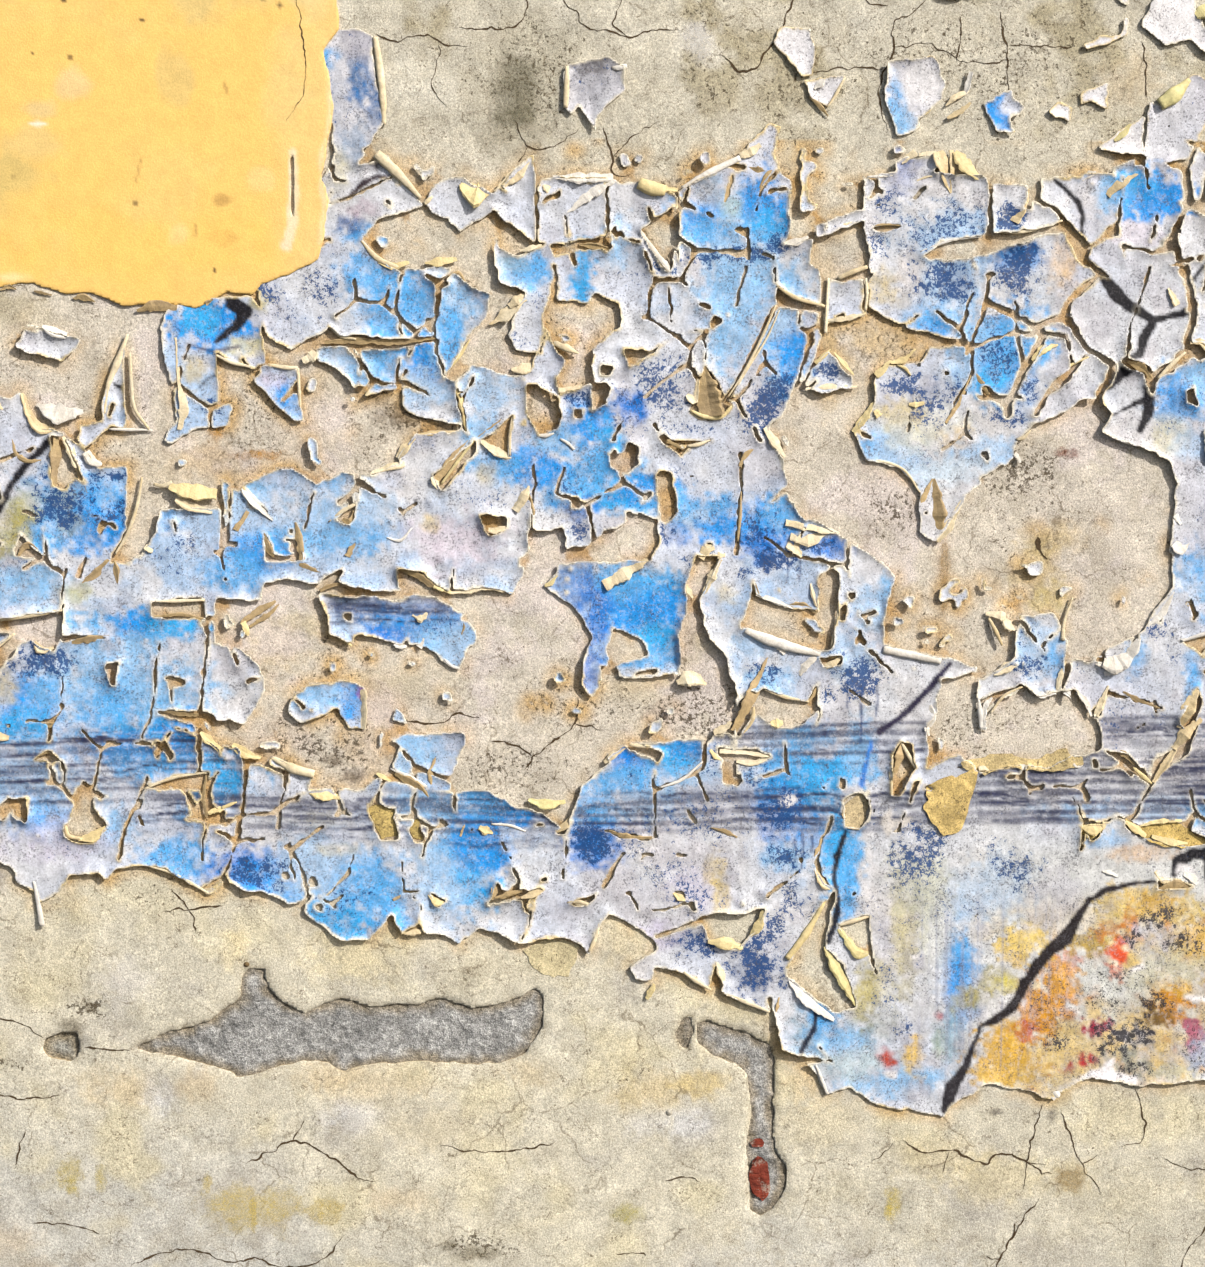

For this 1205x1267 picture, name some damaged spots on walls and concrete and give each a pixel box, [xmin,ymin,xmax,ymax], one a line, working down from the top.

crack [377,0,528,104]
crack [564,0,669,39]
crack [722,0,794,73]
crack [813,0,1071,132]
peeling [1084,0,1205,52]
peeling [0,26,1109,697]
peeling [704,74,1205,957]
peeling [0,604,1205,1117]
crack [246,1121,375,1182]
flaking render [675,1018,787,1215]
crack [871,1089,1147,1267]
crack [130,1236,344,1267]